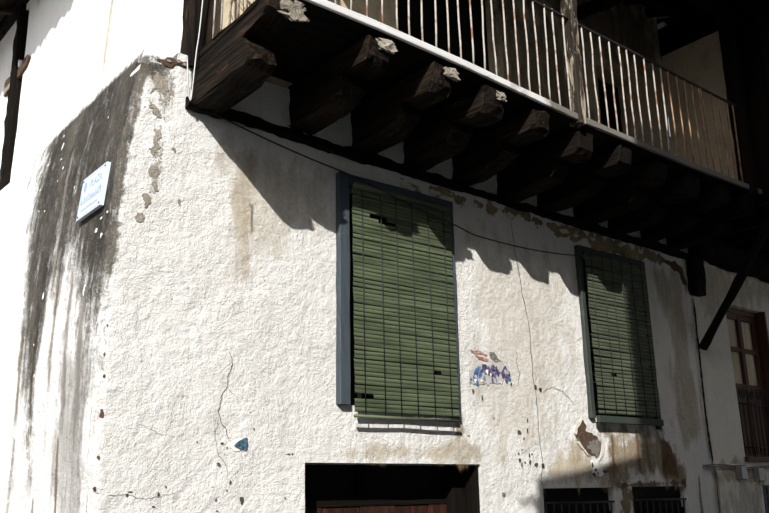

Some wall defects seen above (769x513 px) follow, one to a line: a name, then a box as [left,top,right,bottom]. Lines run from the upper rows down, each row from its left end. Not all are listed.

leakage [14,51,167,458]
spalling [400,178,687,286]
leakage [53,438,79,513]
crack [215,349,239,478]
crack [511,218,571,485]
spalling [574,418,609,477]